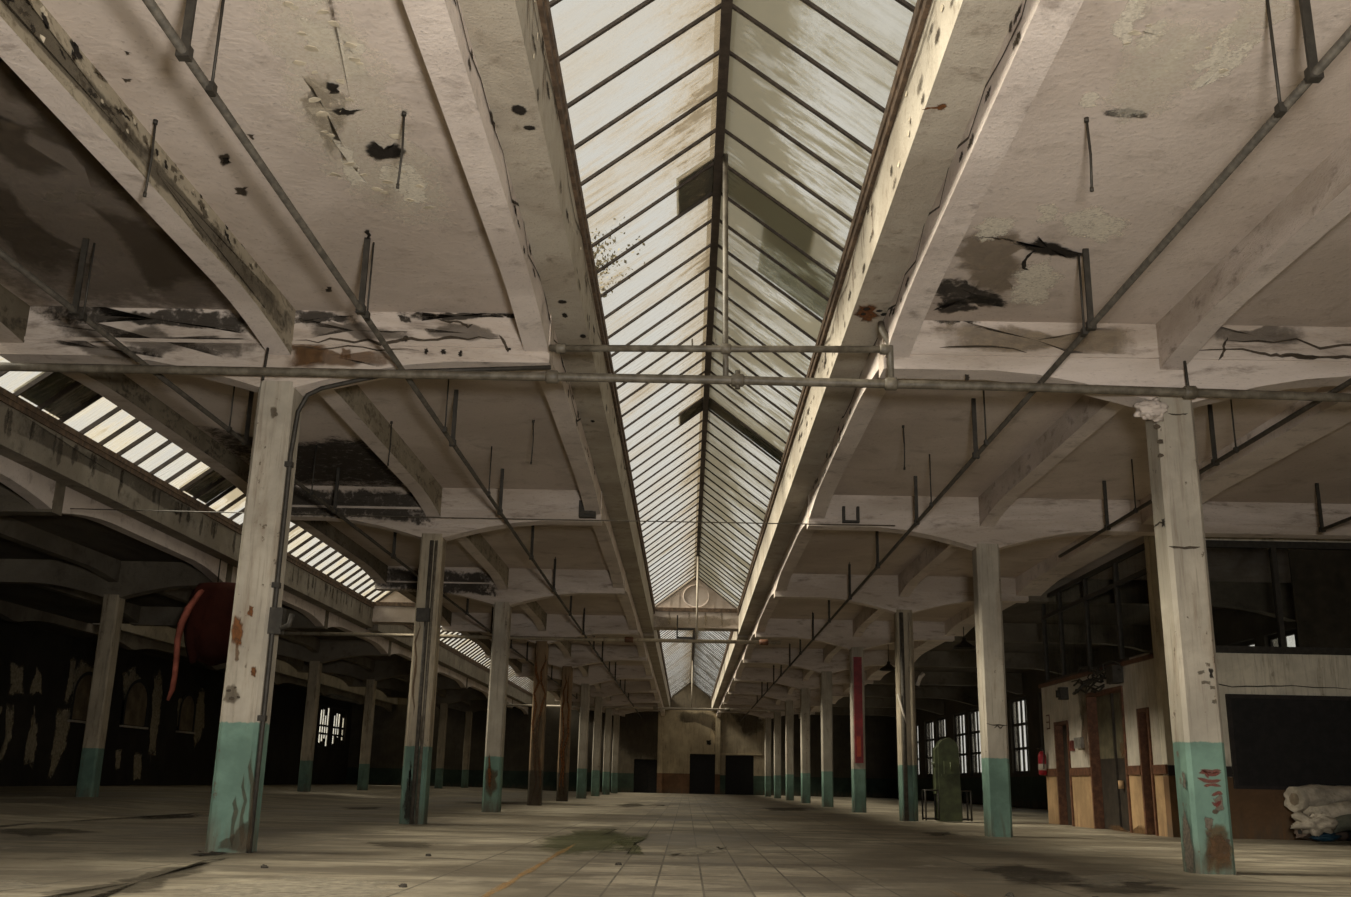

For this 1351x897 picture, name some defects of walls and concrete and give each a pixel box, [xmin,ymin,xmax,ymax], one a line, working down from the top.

peeling [6,0,49,43]
peeling [60,40,84,62]
peeling [88,70,209,218]
peeling [883,0,1027,321]
spalling [982,236,1083,270]
crack [296,319,511,356]
crack [1199,337,1351,360]
peeling [813,371,862,489]
crack [1219,682,1347,690]
peeling [0,659,93,778]
peeling [115,668,162,780]